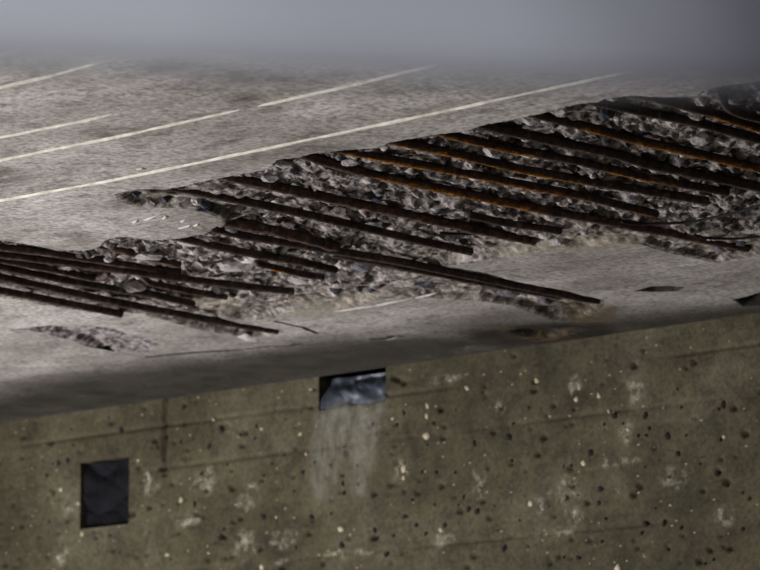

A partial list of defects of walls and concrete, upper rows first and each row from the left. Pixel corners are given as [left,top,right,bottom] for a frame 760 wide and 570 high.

spalling [20,325,160,352]
spalling [0,91,760,343]